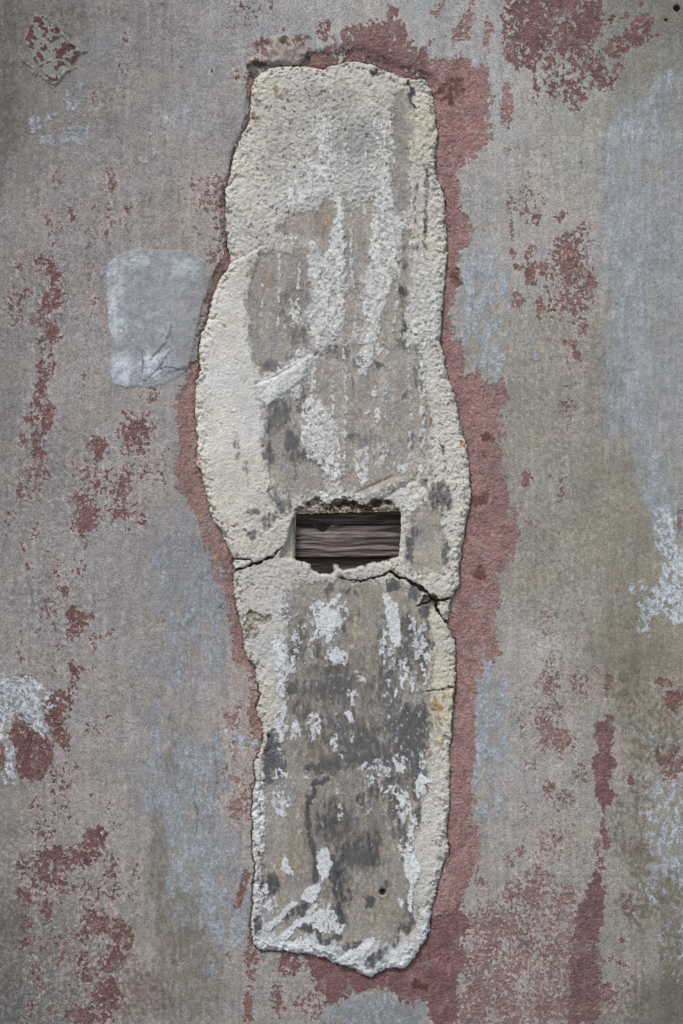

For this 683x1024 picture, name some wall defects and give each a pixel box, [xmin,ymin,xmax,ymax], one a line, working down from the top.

leakage [601,70,683,638]
peeling [190,0,667,1024]
crack [338,570,449,622]
peeling [654,677,683,713]
peeling [655,744,683,782]